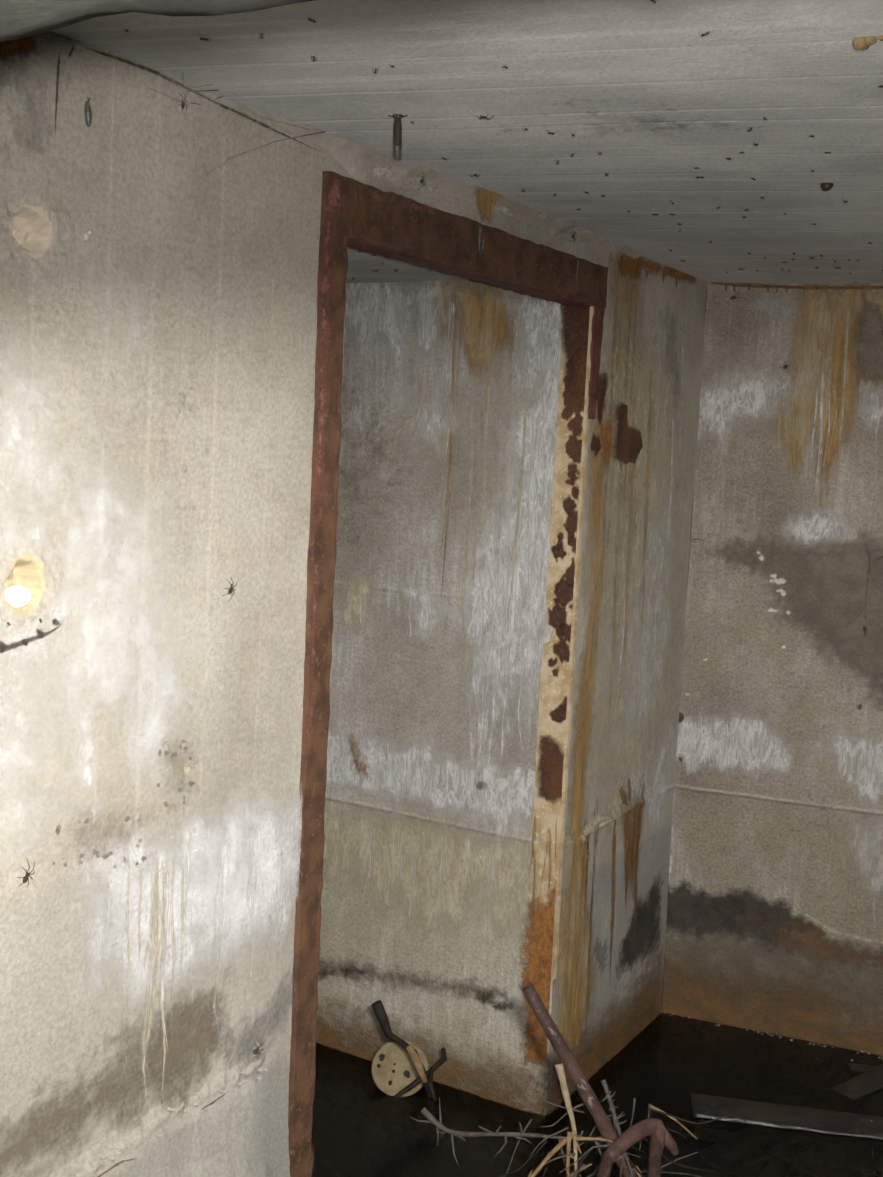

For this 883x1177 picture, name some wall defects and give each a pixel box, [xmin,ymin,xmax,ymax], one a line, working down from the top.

spalling [0,180,92,281]
rust [622,253,695,287]
rust [709,282,883,496]
spalling [0,521,65,649]
rust [442,280,520,686]
rust [522,304,645,1063]
damp [721,535,883,691]
rust [784,513,852,544]
damp [833,735,883,803]
damp [0,801,301,1173]
damp [315,856,883,1153]